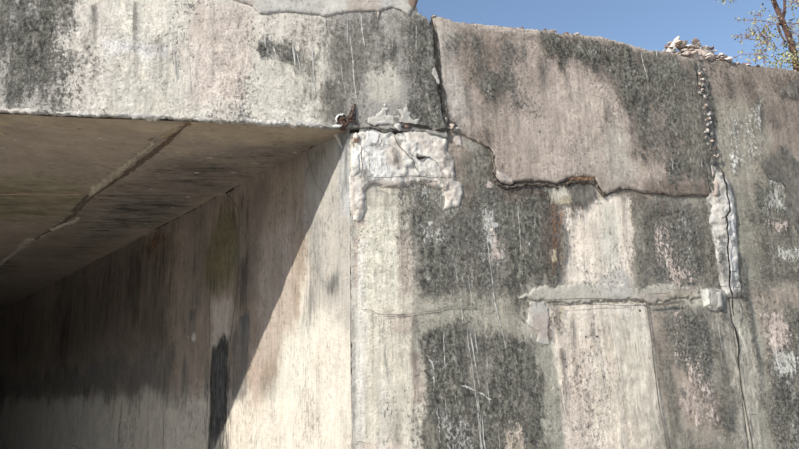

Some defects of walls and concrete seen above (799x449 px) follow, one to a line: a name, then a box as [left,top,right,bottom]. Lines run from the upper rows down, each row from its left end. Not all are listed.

peeling [237,104,463,222]
crack [360,17,457,188]
water stain [250,9,722,290]
crack [483,144,701,203]
water stain [204,314,248,449]
water stain [393,129,595,449]
crack [716,168,757,449]